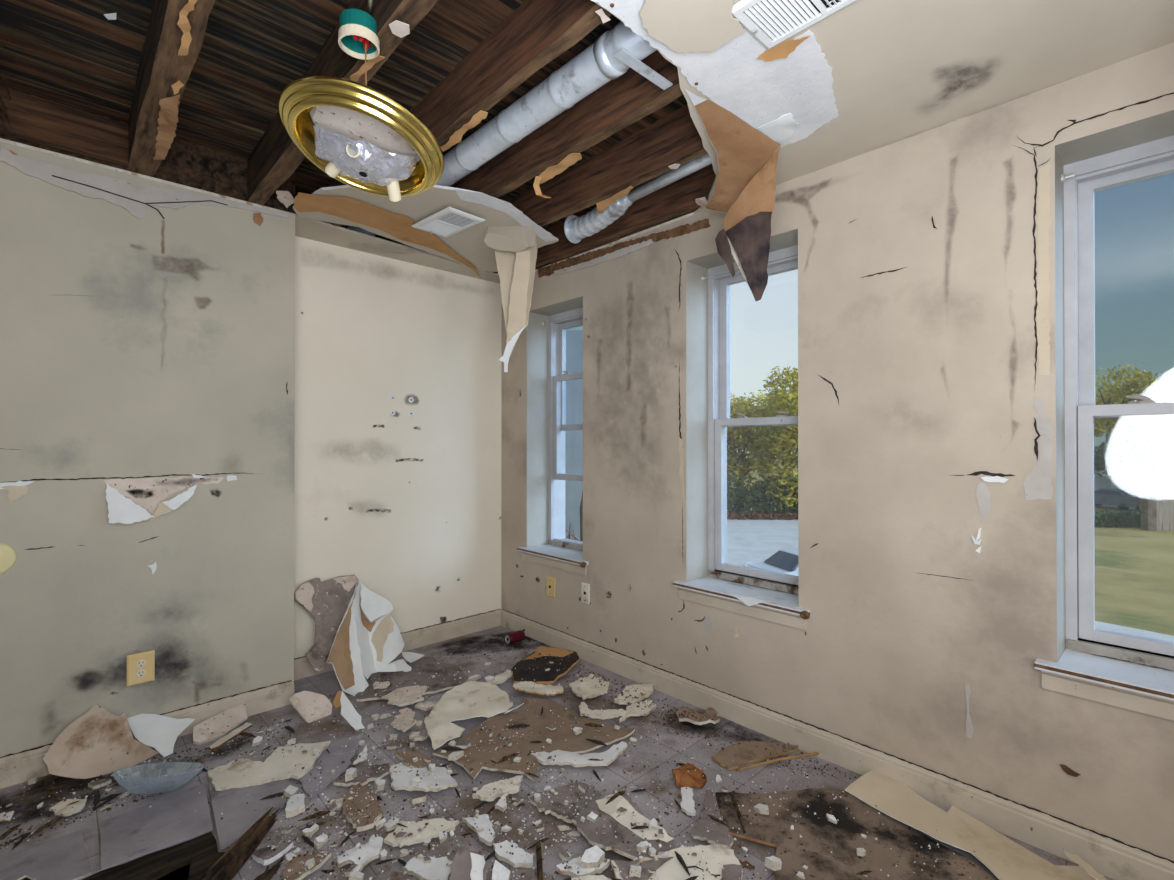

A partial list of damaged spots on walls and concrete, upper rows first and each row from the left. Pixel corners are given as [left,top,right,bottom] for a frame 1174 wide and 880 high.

flaking render [591,0,839,147]
crack [1013,92,1174,387]
crack [0,473,254,501]
peeling [104,476,224,524]
crack [954,471,1016,483]
flaking render [1022,416,1054,501]
flaking render [295,582,314,611]